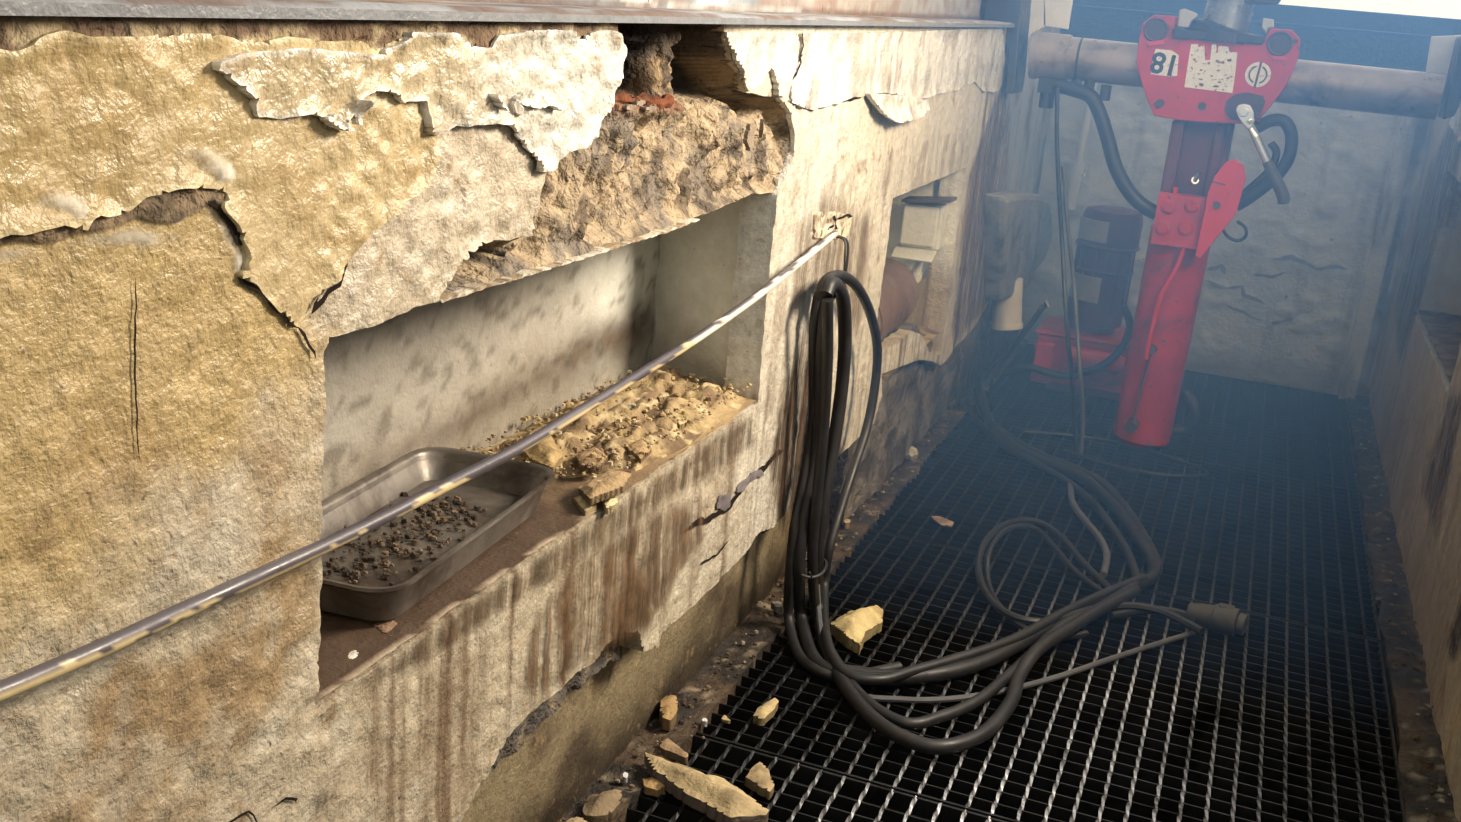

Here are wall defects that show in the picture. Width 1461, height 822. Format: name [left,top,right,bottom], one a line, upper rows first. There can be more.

peeling [0,16,1006,326]
crack [208,199,348,358]
crack [133,280,141,459]
crack [686,449,785,564]
crack [229,797,298,822]